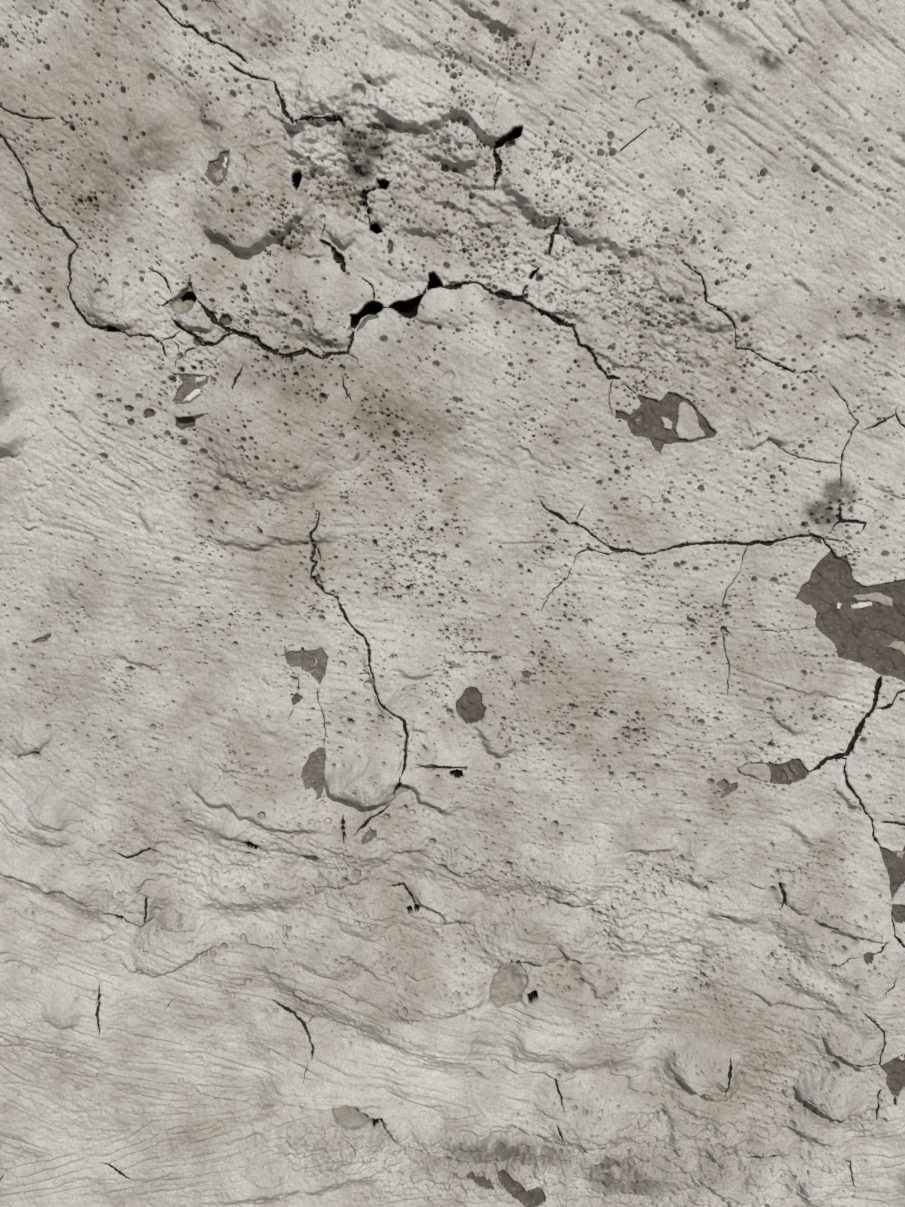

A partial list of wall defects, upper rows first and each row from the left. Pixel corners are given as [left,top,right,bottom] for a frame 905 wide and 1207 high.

crack [156,0,345,128]
crack [0,105,358,402]
crack [319,225,391,309]
crack [421,281,637,413]
spalling [615,392,716,453]
crack [540,259,905,693]
crack [309,512,409,843]
spalling [456,687,486,724]
spalling [795,551,905,682]
crack [807,676,905,847]
spalling [879,846,905,923]
spalling [881,1055,905,1105]